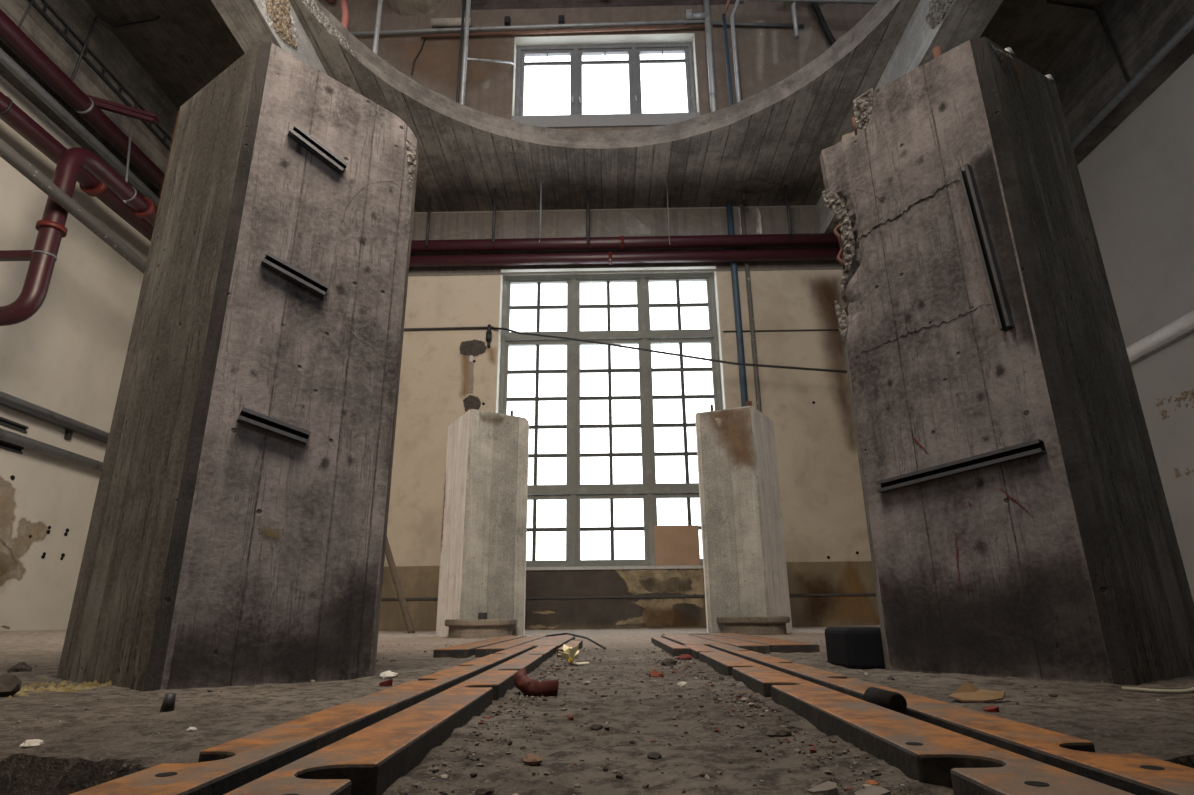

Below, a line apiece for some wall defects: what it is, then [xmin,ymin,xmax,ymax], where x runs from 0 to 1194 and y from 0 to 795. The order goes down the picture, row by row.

spalling [258,0,358,58]
spalling [925,0,954,29]
spalling [853,88,873,129]
crack [838,180,960,247]
spalling [822,189,855,340]
crack [854,304,991,357]